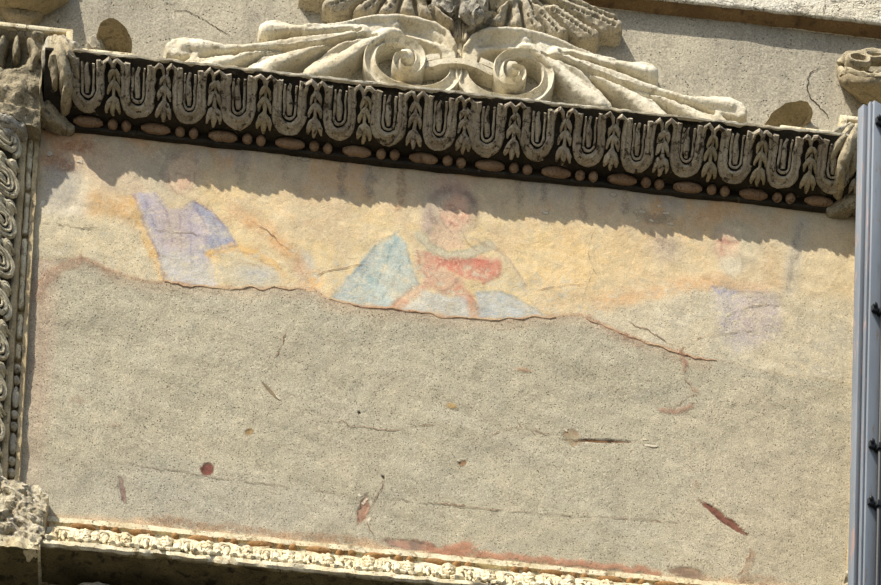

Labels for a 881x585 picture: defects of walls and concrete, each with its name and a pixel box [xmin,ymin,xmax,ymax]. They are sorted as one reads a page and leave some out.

crack [806,66,830,117]
peeling [164,280,314,292]
peeling [329,298,556,321]
peeling [586,317,717,361]
crack [629,304,786,414]
crack [333,420,433,431]
spalling [564,429,630,446]
spalling [200,462,213,475]
spalling [357,494,372,524]
spalling [703,502,749,535]
spalling [386,538,436,550]
spalling [669,566,704,580]